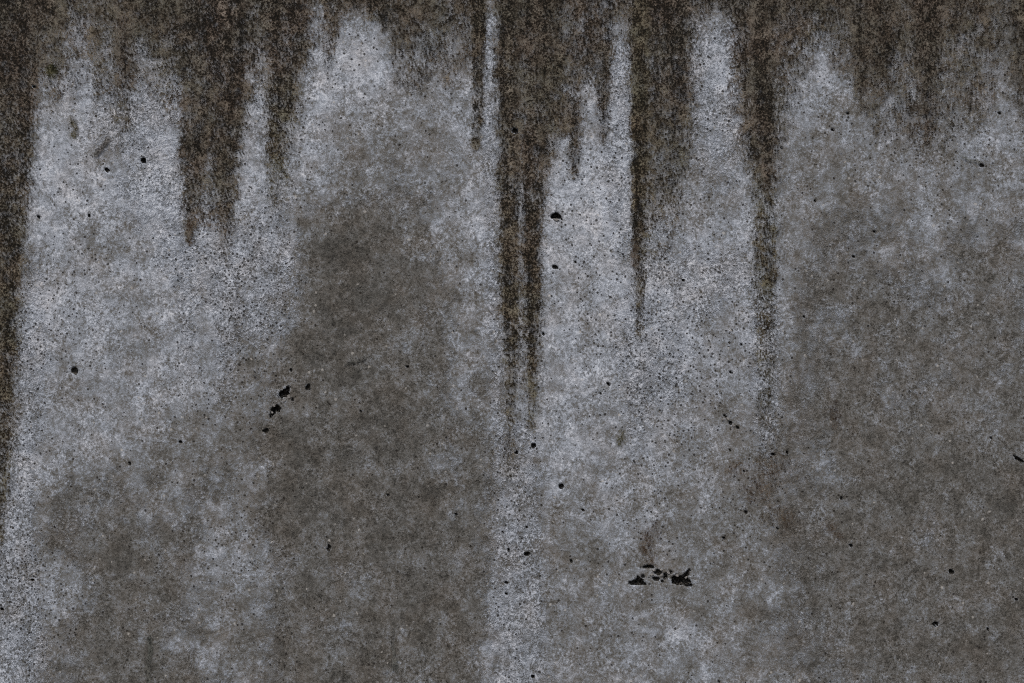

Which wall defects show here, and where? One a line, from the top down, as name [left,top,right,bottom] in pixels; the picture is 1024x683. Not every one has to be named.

damp [773,0,1024,160]
damp [0,0,796,683]
damp [766,203,1024,683]